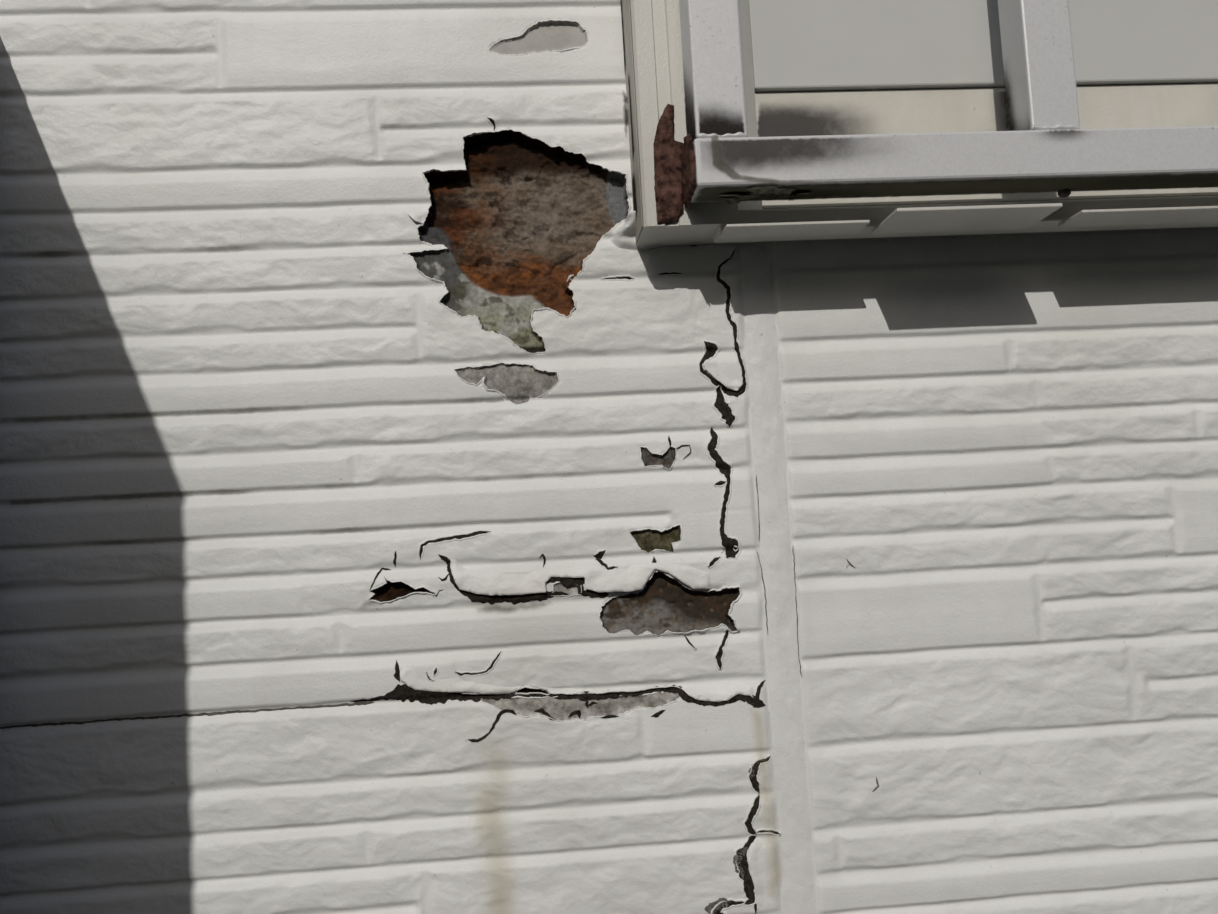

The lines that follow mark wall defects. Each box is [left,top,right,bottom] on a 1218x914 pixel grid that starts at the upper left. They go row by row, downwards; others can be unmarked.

peeling [488,19,589,56]
spalling [403,128,632,406]
crack [601,246,684,282]
peeling [639,446,677,471]
crack [668,247,802,676]
crack [369,529,618,605]
spalling [450,524,743,637]
crack [650,556,658,572]
crack [0,650,765,742]
crack [704,755,781,914]